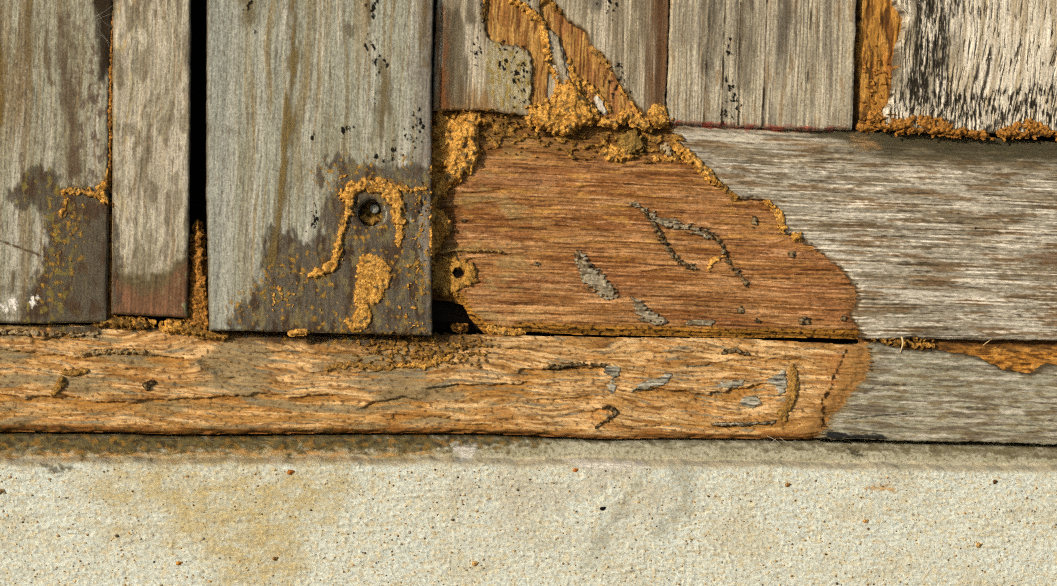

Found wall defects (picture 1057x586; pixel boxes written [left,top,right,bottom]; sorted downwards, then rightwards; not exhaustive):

damp [242,0,256,34]
damp [364,0,390,127]
damp [8,0,121,336]
damp [227,24,432,346]
peeling [617,128,647,155]
peeling [660,143,673,156]
peeling [629,201,749,287]
peeling [573,250,668,326]
damp [0,422,561,460]
efflorescence [567,459,648,471]
damp [780,440,915,454]
damp [927,441,1057,459]